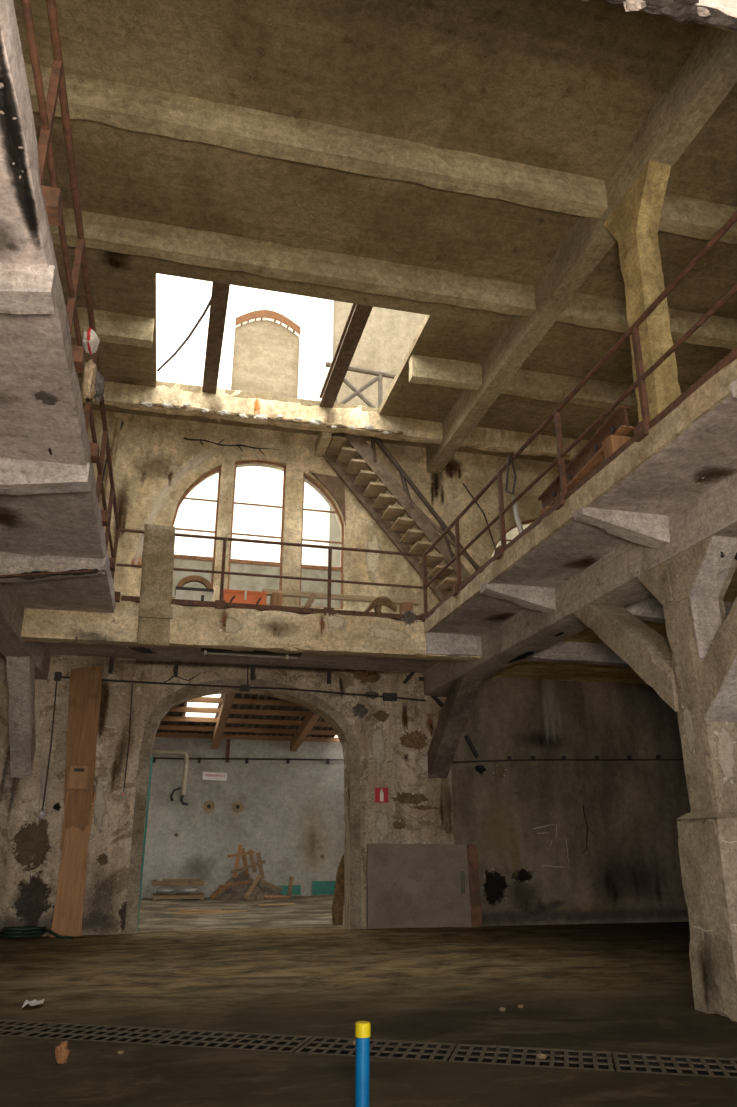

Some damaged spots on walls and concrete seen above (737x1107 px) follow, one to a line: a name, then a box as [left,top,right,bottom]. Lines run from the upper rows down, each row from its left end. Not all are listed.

spalling [605,0,737,32]
leakage [0,30,39,242]
peeling [7,802,61,927]
spalling [481,867,536,907]